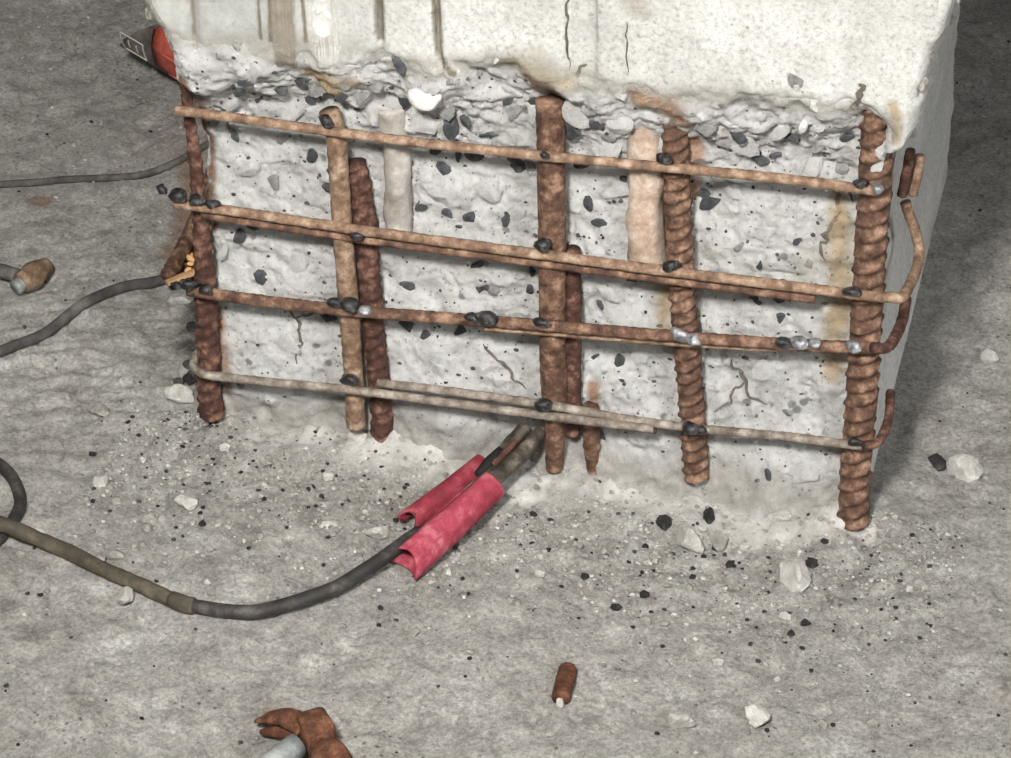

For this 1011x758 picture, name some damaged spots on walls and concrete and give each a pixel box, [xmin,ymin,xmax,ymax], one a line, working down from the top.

rust [305,70,356,92]
rust [504,61,560,96]
rust [179,75,215,200]
rust [689,138,702,165]
spalling [145,0,960,531]
rust [589,382,598,399]
crack [727,359,767,406]